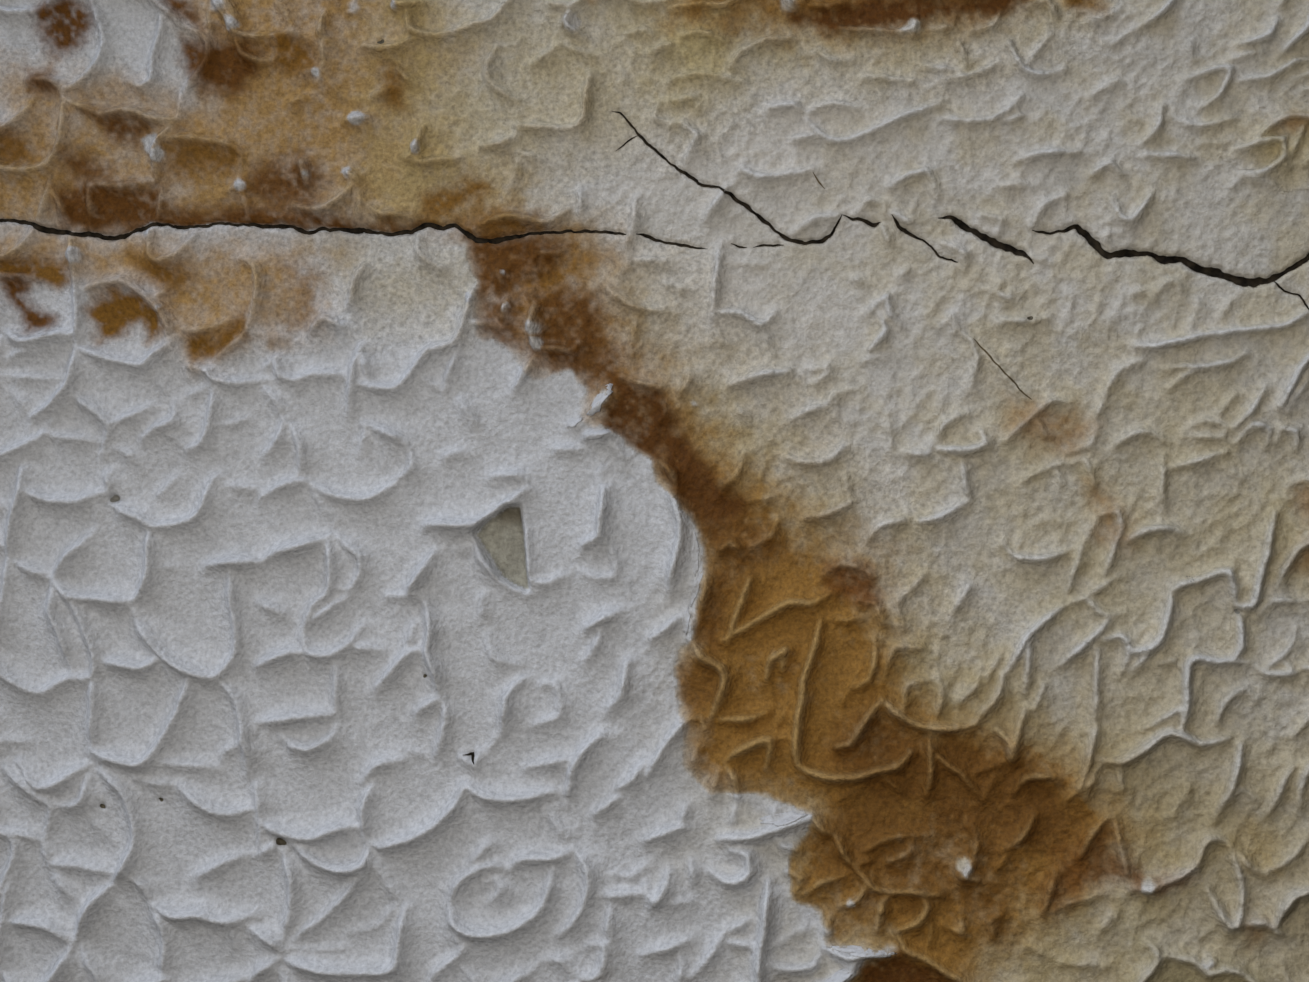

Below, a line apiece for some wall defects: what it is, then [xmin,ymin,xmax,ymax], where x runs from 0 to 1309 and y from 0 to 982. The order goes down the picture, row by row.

leakage [498,0,655,37]
crack [0,111,1309,310]
crack [973,338,1032,400]